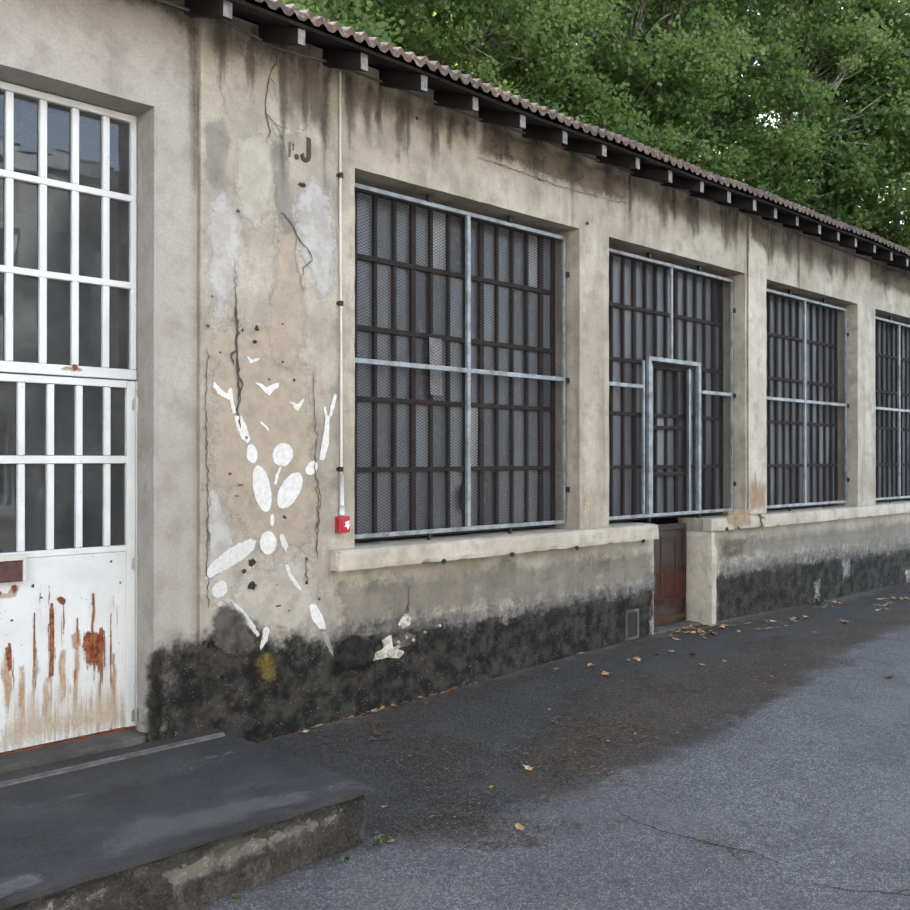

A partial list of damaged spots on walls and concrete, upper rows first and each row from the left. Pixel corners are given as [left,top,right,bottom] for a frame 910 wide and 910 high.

water stain [215,20,329,143]
crack [265,44,290,165]
peeling [206,135,274,319]
crack [281,213,313,291]
crack [204,266,244,608]
peeling [207,325,321,631]
rust [0,585,18,598]
rust [0,592,134,756]
water stain [144,555,654,743]
spalling [374,614,427,660]
rust [654,569,685,623]
water stain [716,524,910,621]